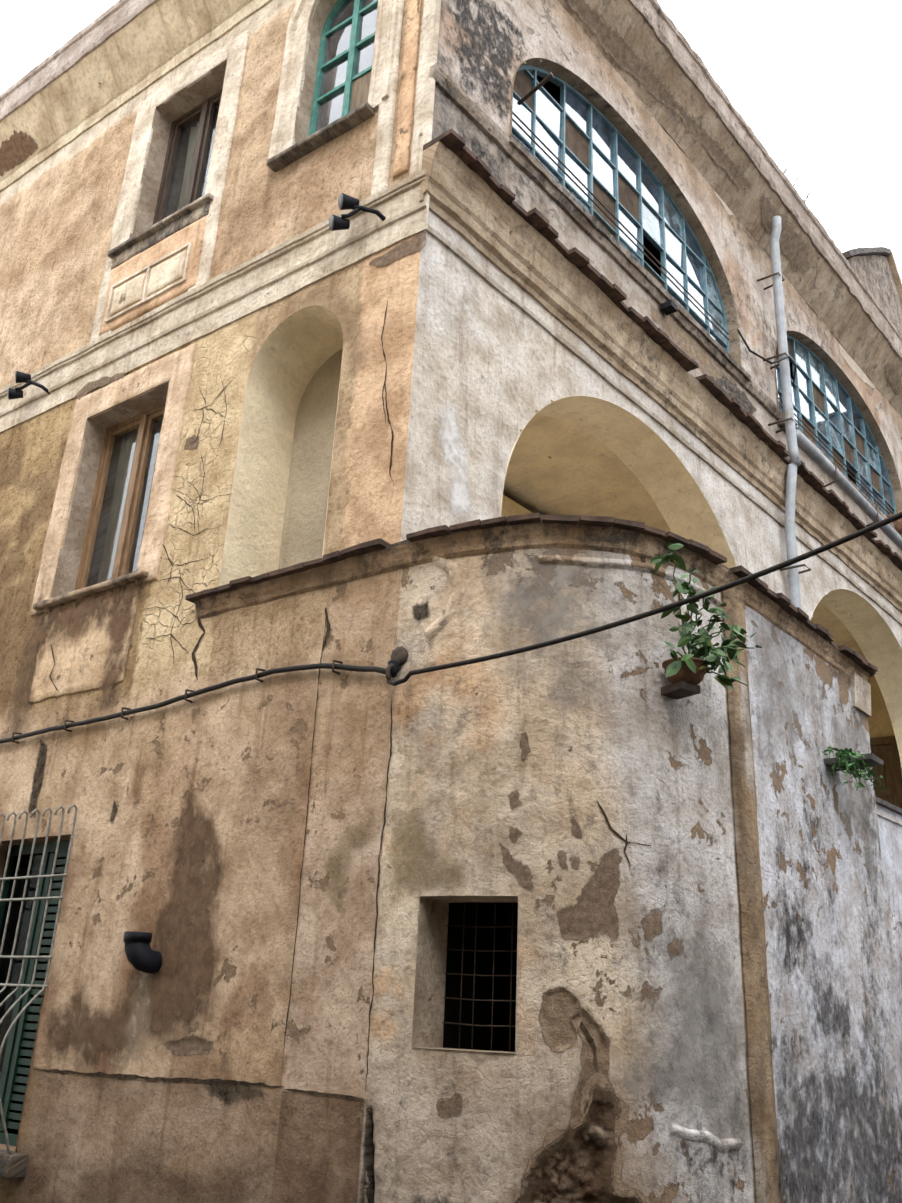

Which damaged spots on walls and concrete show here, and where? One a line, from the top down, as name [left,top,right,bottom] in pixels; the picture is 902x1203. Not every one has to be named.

water stain [449,0,523,119]
crack [381,302,394,483]
crack [138,378,234,681]
water stain [48,796,222,1065]
peeling [571,816,582,838]
flaking render [557,848,622,940]
crack [597,801,651,864]
water stain [778,910,805,968]
flaking render [516,987,647,1203]
water stain [770,976,902,1203]